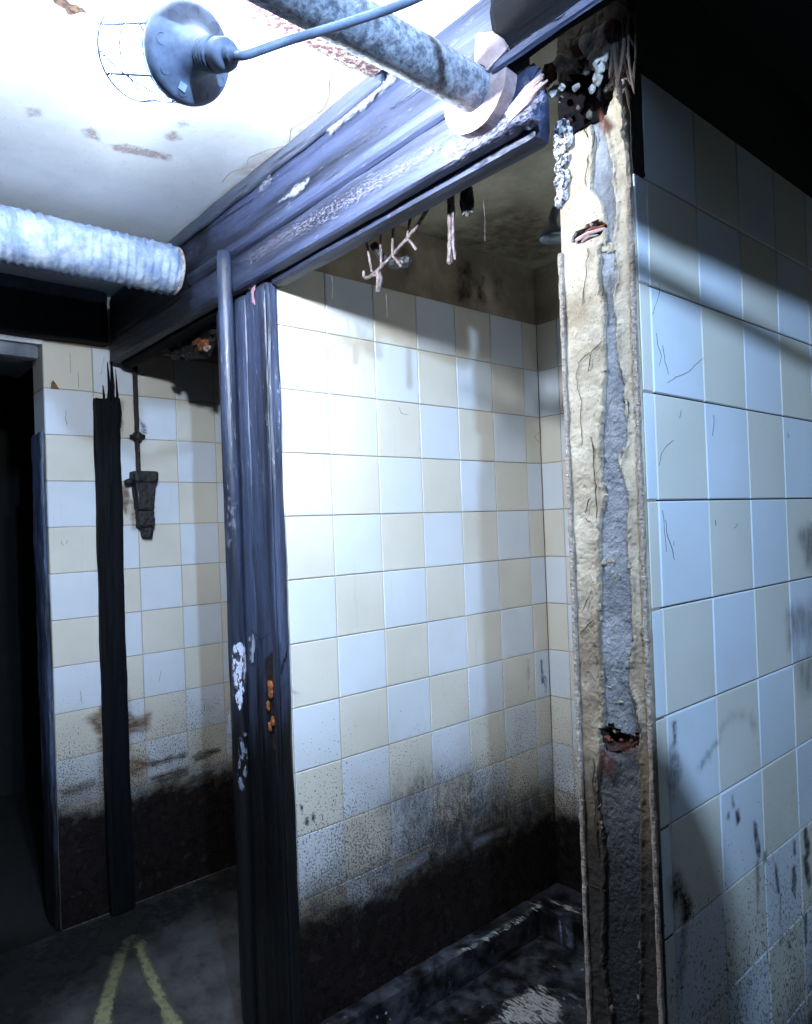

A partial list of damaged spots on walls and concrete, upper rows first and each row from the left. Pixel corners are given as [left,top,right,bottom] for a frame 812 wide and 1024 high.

spalling [245,19,645,265]
crack [652,287,697,382]
crack [576,344,600,522]
spalling [553,105,641,1024]
peeling [226,634,255,735]
water stain [0,749,237,1024]
water stain [299,795,583,1024]
water stain [671,874,692,949]
water stain [792,828,810,895]